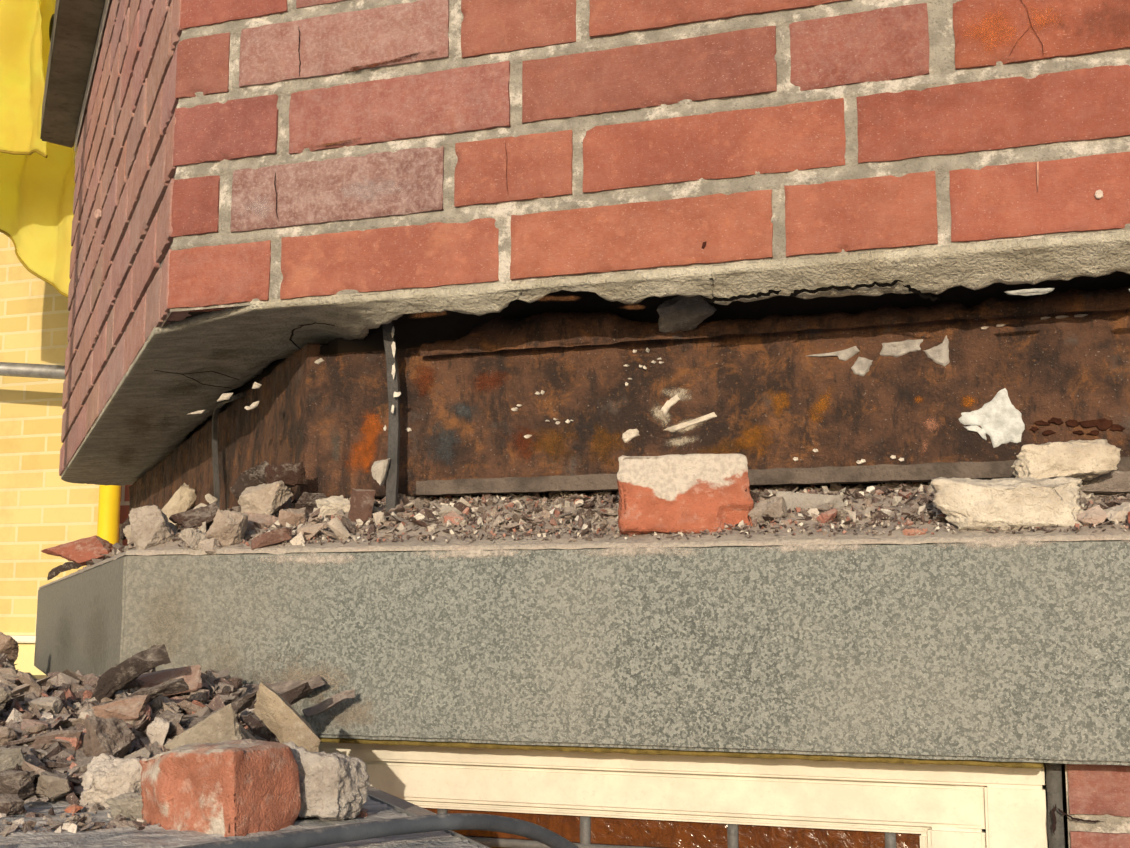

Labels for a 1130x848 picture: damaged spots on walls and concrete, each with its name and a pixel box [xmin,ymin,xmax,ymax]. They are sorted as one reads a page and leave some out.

peeling [1005,288,1055,296]
crack [280,323,335,364]
peeling [808,335,950,376]
crack [154,370,239,388]
peeling [959,388,1125,448]
rust [230,461,270,500]
rust [1079,471,1130,495]
rust [169,501,220,529]